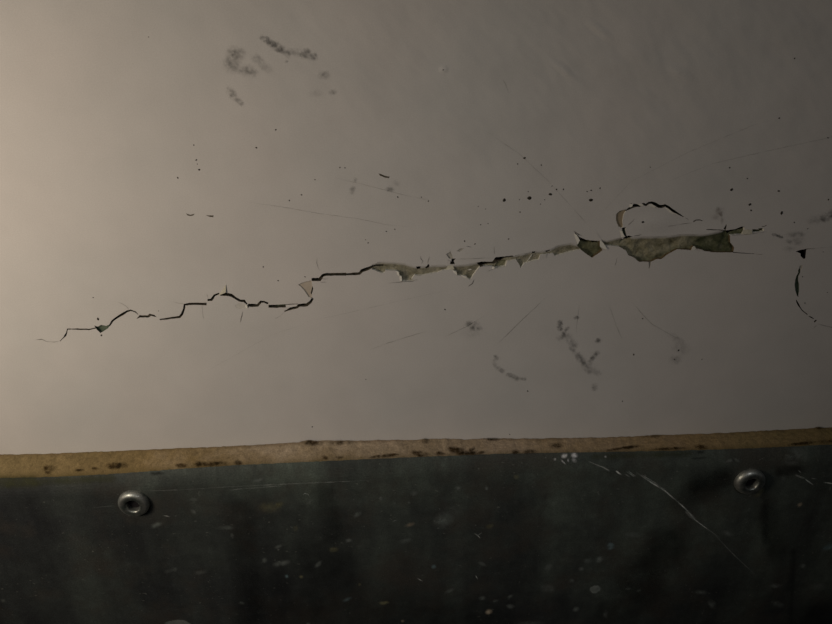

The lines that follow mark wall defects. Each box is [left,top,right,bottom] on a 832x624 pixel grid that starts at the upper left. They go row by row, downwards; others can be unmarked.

crack [616,201,767,237]
spalling [372,230,761,286]
crack [38,265,376,341]
crack [795,265,817,323]